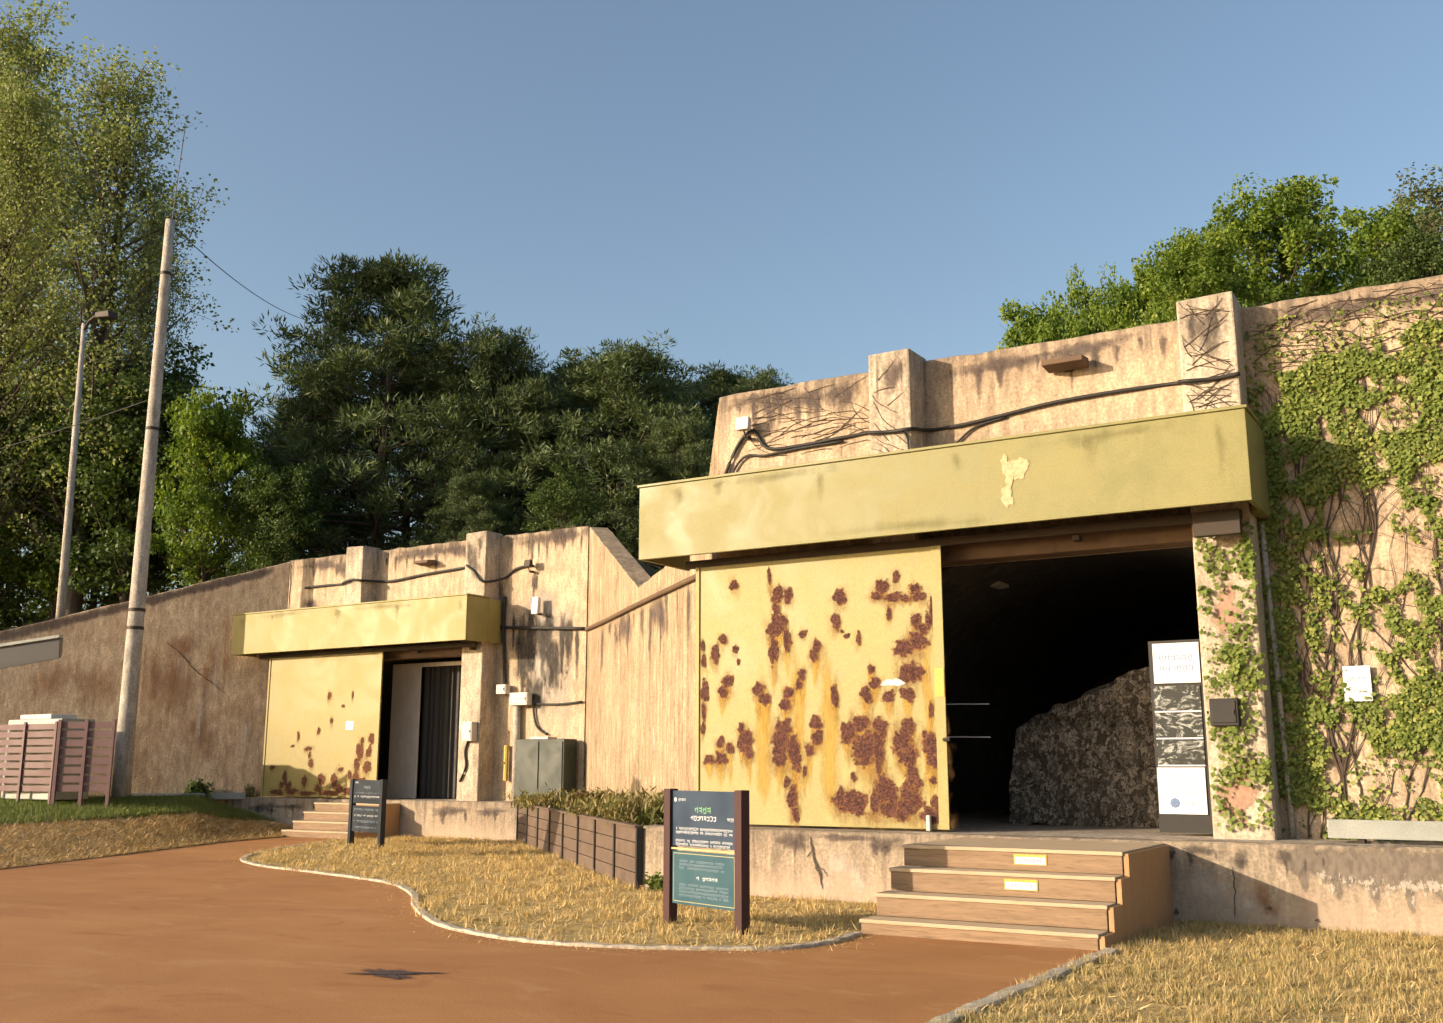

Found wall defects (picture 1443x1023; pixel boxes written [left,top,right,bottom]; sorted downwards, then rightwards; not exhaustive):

damp [1188,309,1217,351]
damp [876,362,902,387]
damp [950,341,1118,391]
damp [737,385,857,427]
peeling [1000,453,1029,508]
rust [700,566,939,824]
rust [270,691,374,795]